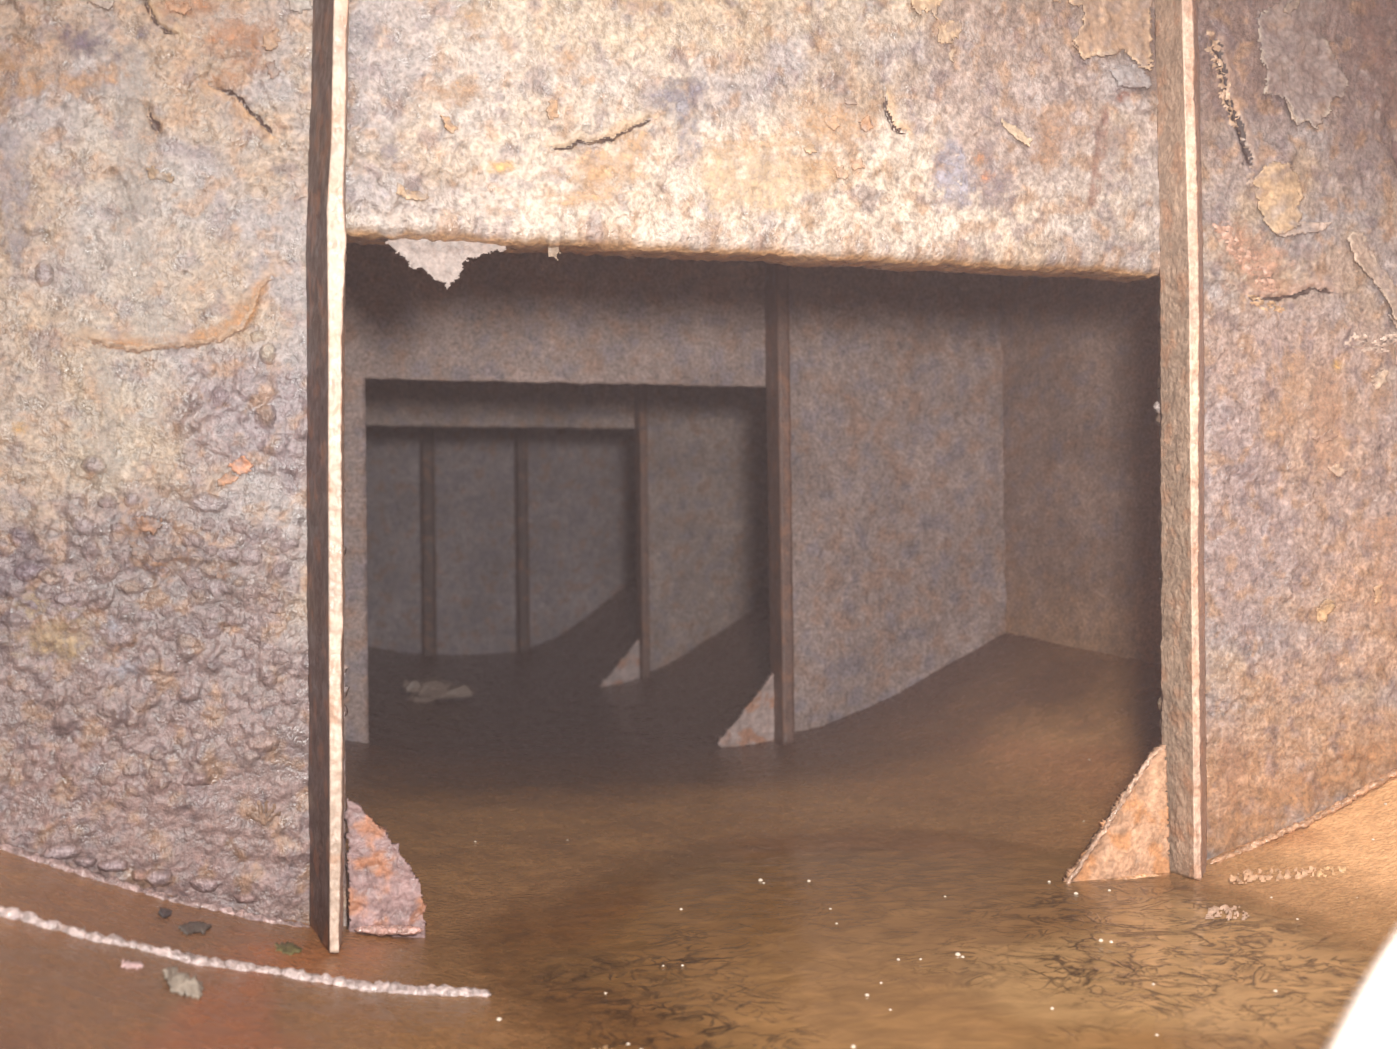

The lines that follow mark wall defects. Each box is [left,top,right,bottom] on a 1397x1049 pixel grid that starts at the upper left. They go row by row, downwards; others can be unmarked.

peeling [911,0,962,63]
peeling [1053,0,1154,100]
peeling [1255,0,1349,129]
peeling [1204,30,1332,238]
peeling [385,238,506,290]
peeling [1347,231,1397,329]
peeling [1370,368,1389,390]
rust [0,483,305,801]
rust [1316,599,1336,622]